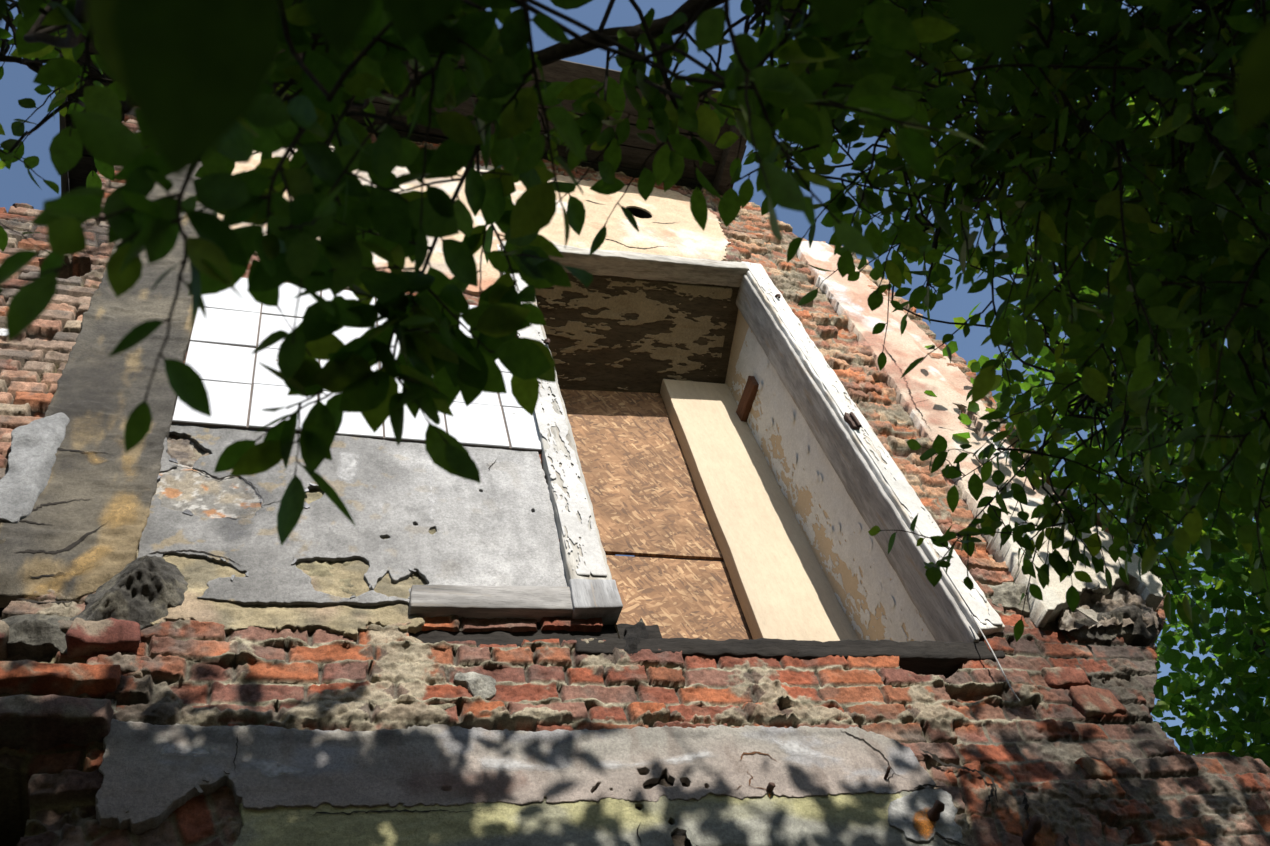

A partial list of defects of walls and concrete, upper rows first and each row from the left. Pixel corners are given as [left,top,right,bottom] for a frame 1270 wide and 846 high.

peeling [156,431,263,519]
spalling [305,483,324,509]
peeling [503,273,732,576]
peeling [729,262,1003,642]
crack [14,498,108,603]
spalling [291,558,372,599]
spalling [408,568,428,599]
spalling [63,768,242,846]
crack [308,808,495,816]
peeling [686,827,699,846]
corrosion [913,808,935,838]
crack [843,731,1070,846]